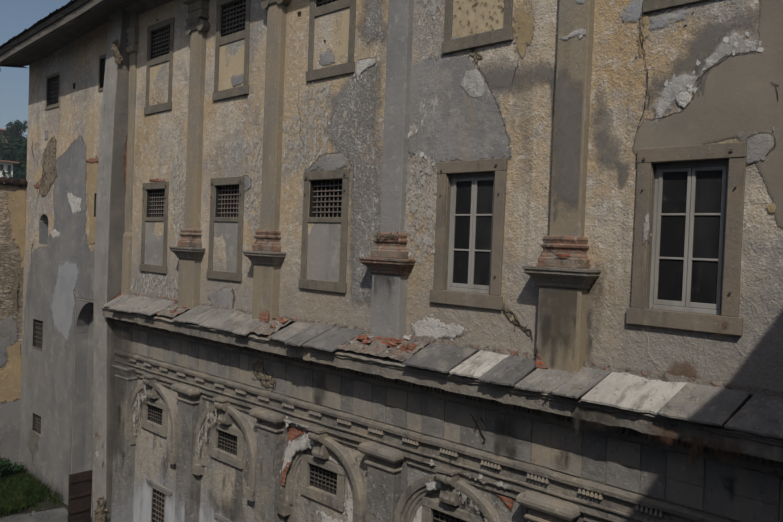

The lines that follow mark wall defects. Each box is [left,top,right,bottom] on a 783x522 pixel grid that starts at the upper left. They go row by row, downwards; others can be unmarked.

peeling [460,48,510,156]
crack [635,14,650,135]
peeling [632,31,764,149]
damp [597,107,627,186]
peeling [6,130,83,270]
peeling [67,155,99,245]
peeling [0,315,25,402]
peeling [411,314,467,346]
crack [504,311,533,339]
peeling [279,416,313,486]
crack [471,415,486,443]
peeling [316,480,353,522]